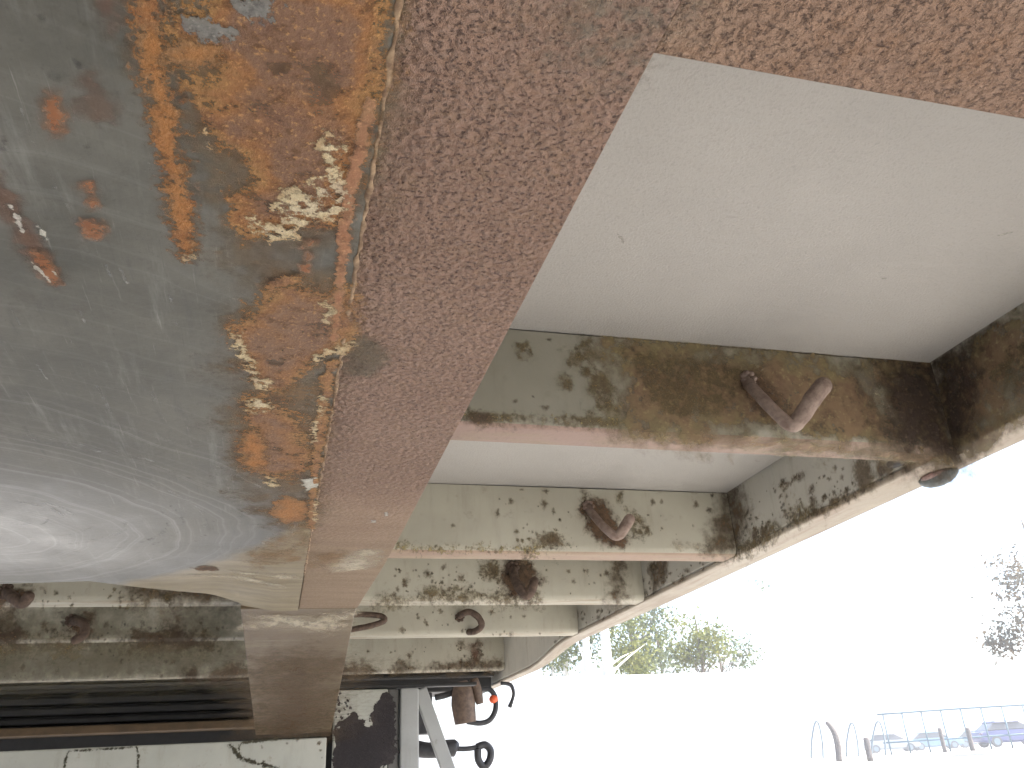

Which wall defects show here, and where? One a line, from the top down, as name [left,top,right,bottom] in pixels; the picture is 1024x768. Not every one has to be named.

corrosion [42,91,69,134]
corrosion [76,180,109,241]
corrosion [122,0,412,585]
leakage [575,307,1024,481]
corrosion [578,491,651,549]
corrosion [500,560,544,606]